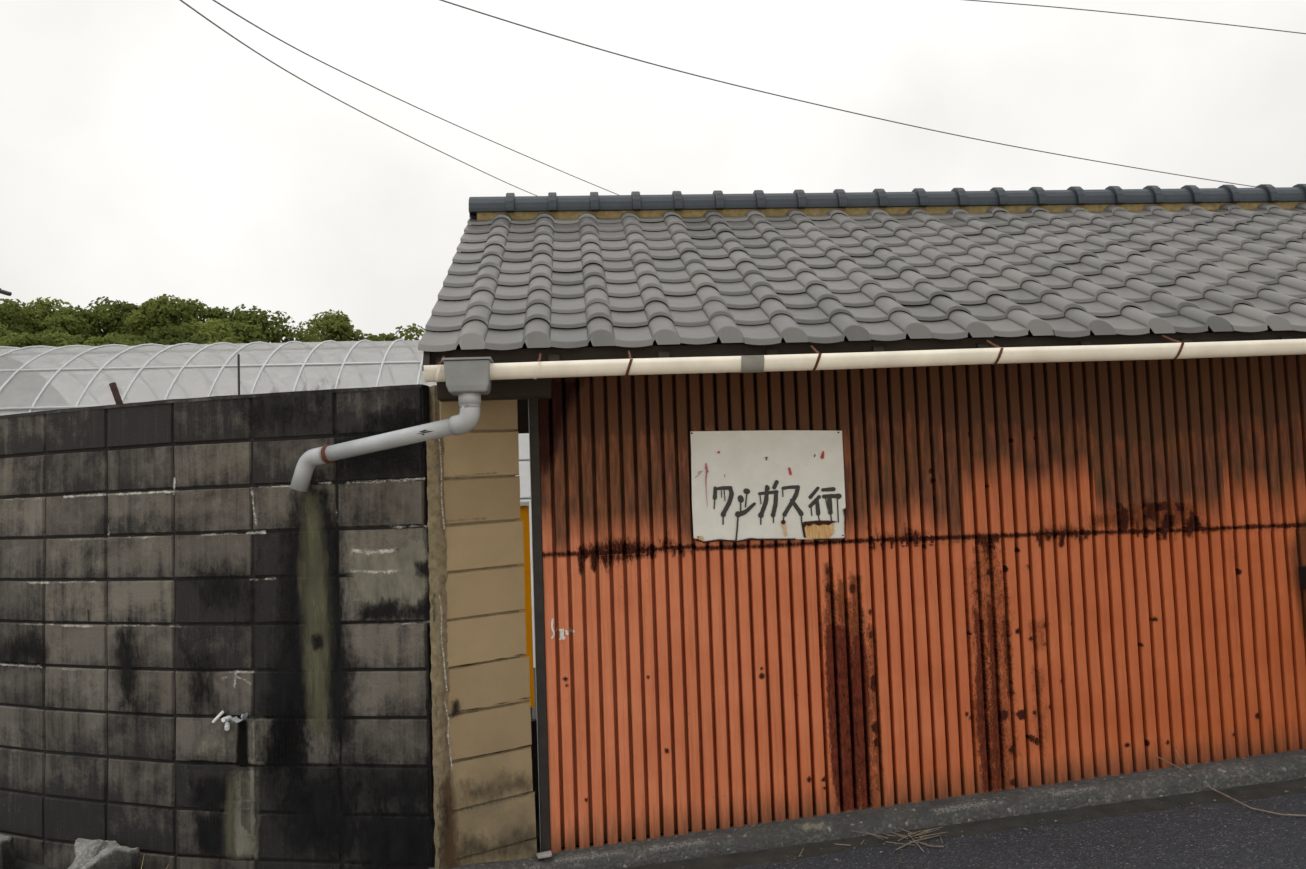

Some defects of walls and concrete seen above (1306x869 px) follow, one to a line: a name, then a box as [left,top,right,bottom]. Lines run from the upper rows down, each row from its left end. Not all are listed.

leakage [336,407,425,484]
leakage [63,478,176,498]
leakage [115,625,154,705]
leakage [193,482,448,869]
corrosion [542,501,1306,811]